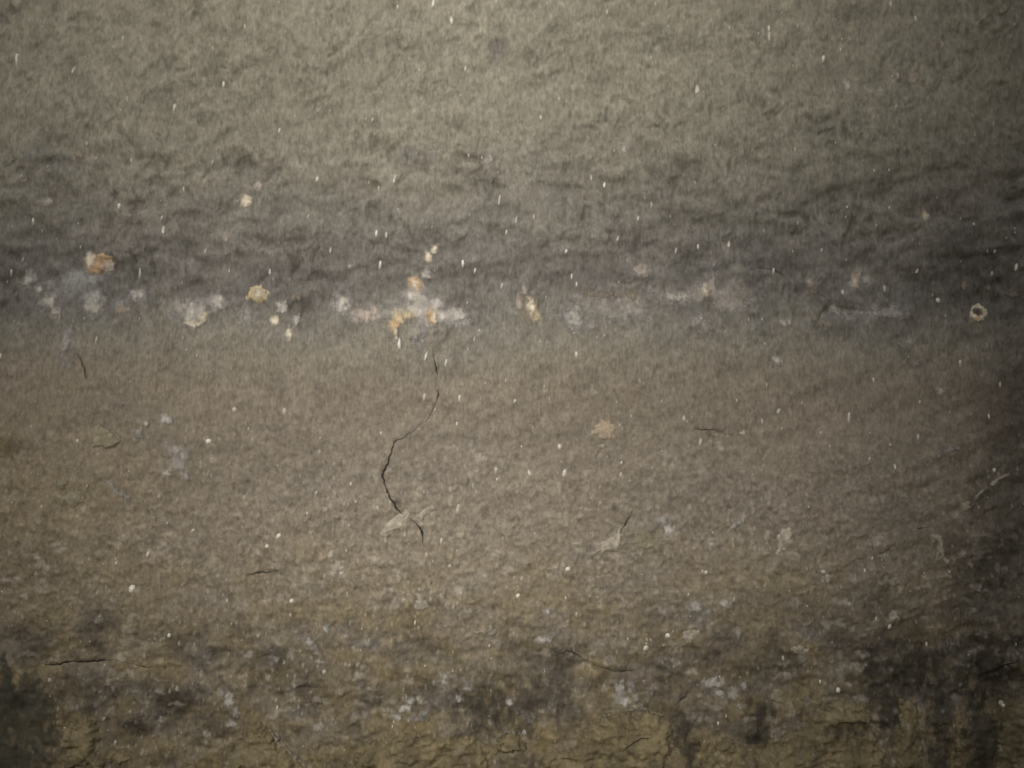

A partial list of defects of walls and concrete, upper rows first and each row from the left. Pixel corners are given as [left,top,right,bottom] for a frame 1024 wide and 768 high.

corrosion [86,252,114,276]
damp [23,270,148,318]
damp [171,293,251,329]
corrosion [245,285,269,304]
damp [270,293,300,338]
damp [332,246,469,347]
damp [561,262,750,334]
crack [381,339,439,543]
crack [42,659,151,668]
crack [550,650,634,672]
damp [701,676,776,744]
damp [826,646,1020,768]